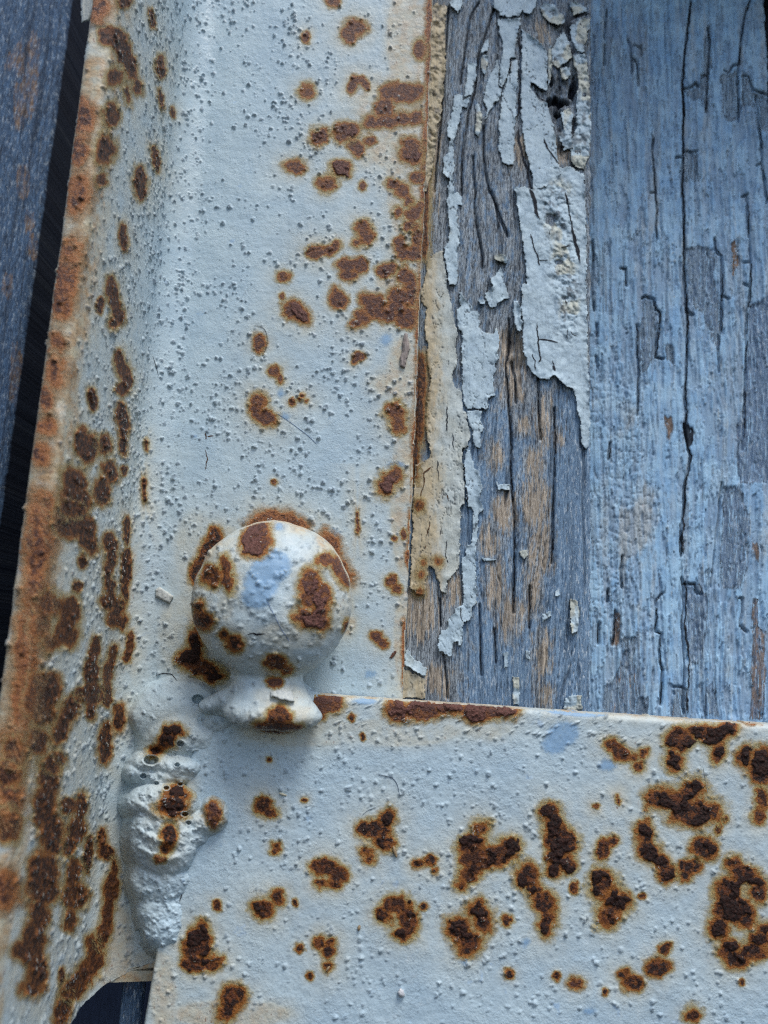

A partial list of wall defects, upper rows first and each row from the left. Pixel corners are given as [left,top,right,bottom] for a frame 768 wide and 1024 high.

corrosion [276,0,445,598]
peeling [410,0,591,656]
crack [622,1,768,554]
corrosion [0,0,144,1024]
corrosion [173,507,358,687]
peeling [403,649,427,699]
peeling [503,652,520,705]
crack [597,556,623,642]
crack [655,563,721,713]
corrosion [178,899,227,975]
corrosion [441,721,768,986]
corrosion [602,941,675,997]